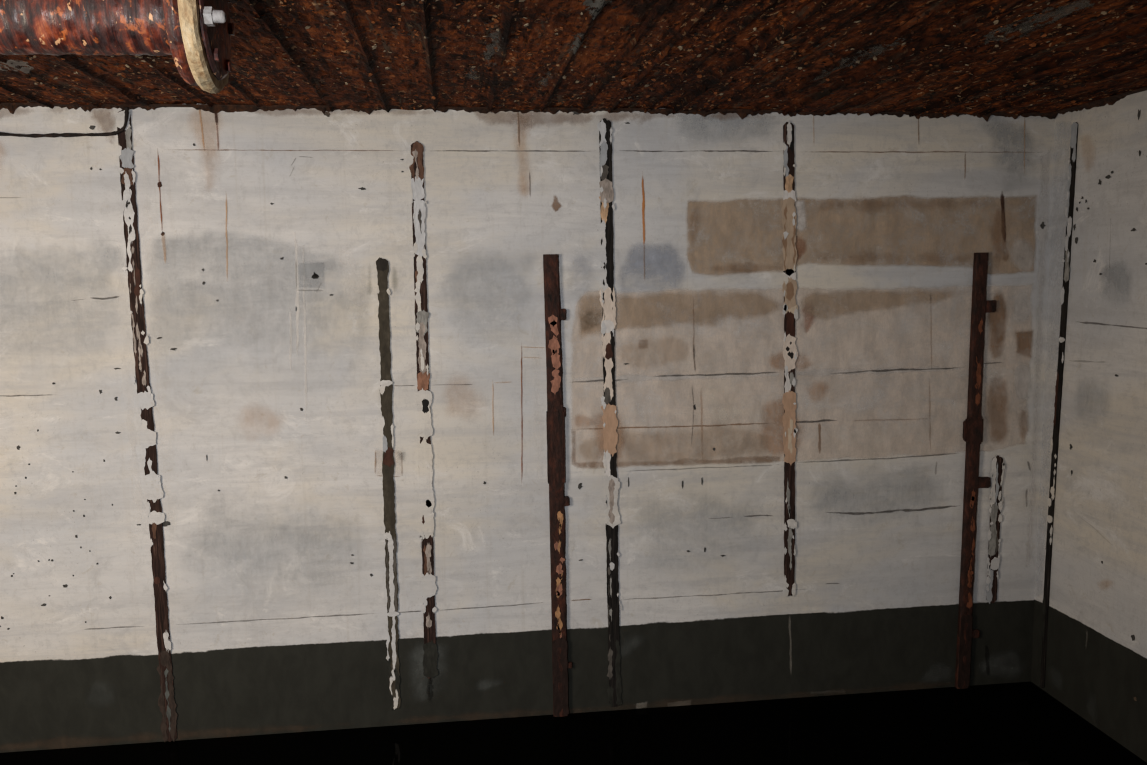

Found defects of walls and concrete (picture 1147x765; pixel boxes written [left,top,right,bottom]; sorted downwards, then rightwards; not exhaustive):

corrosion [121,167,133,185]
corrosion [132,267,140,301]
corrosion [0,102,378,145]
peeling [379,416,394,452]
peeling [597,119,630,622]
corrosion [424,106,865,143]
peeling [781,120,798,321]
peeling [782,333,798,465]
leakage [572,196,1035,467]
corrosion [879,86,1147,166]
peeling [985,456,1005,604]
peeling [384,531,399,710]